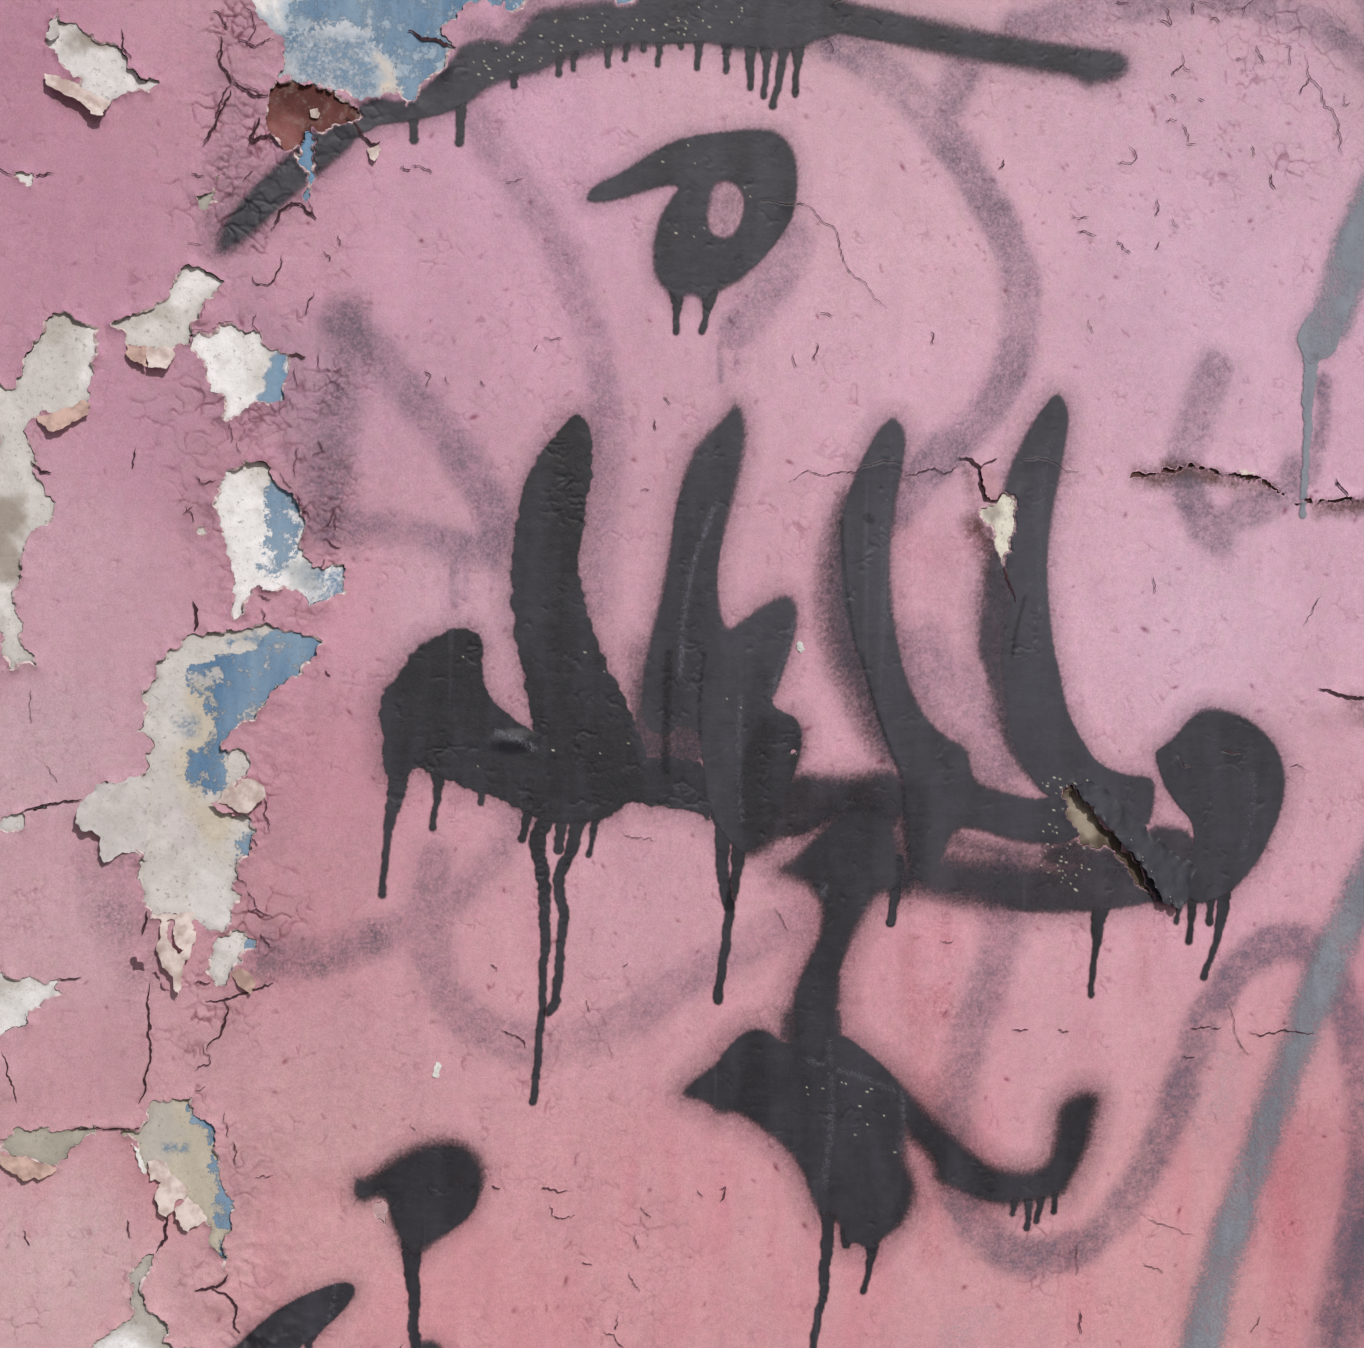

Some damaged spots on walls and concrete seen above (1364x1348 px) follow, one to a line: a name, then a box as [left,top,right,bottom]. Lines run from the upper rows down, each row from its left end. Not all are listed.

peeling [44,14,159,116]
crack [191,4,283,181]
peeling [204,0,524,223]
peeling [0,264,306,669]
crack [280,440,341,568]
peeling [959,457,1016,602]
crack [1130,463,1352,506]
peeling [0,461,346,994]
crack [251,798,270,846]
crack [70,983,152,1130]
crack [223,1113,273,1178]
peeling [93,1098,240,1348]